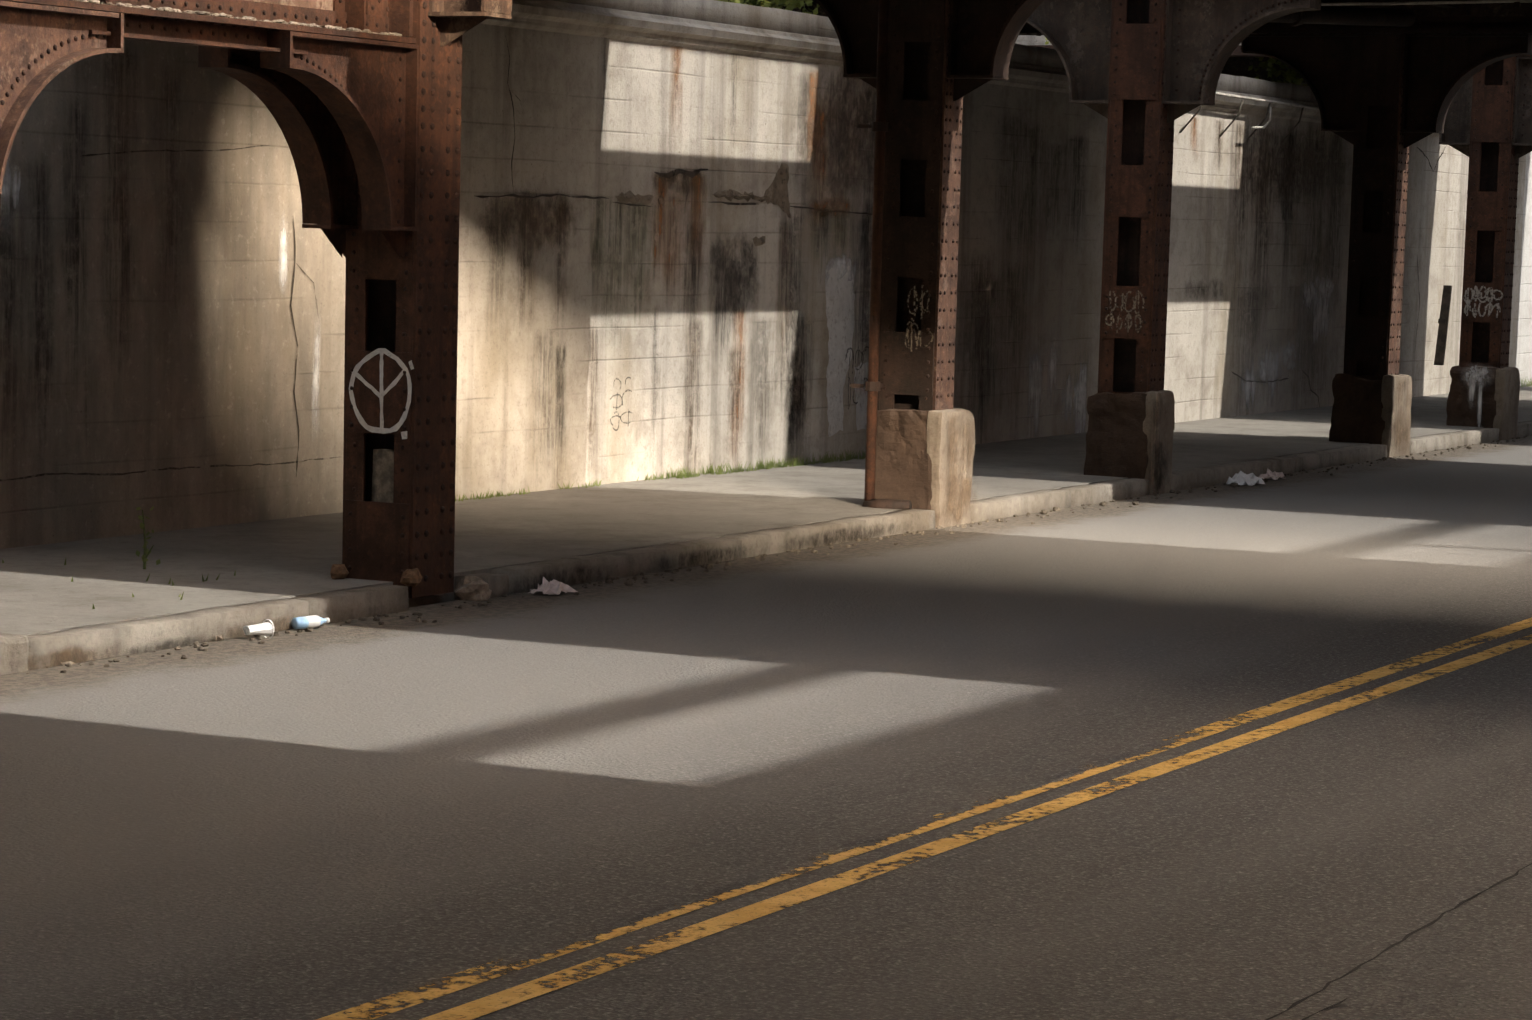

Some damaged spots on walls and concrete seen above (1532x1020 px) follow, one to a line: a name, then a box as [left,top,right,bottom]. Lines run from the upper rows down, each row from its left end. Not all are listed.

damp [487,197,571,293]
rust [654,173,702,289]
damp [713,242,754,332]
rust [731,313,743,428]